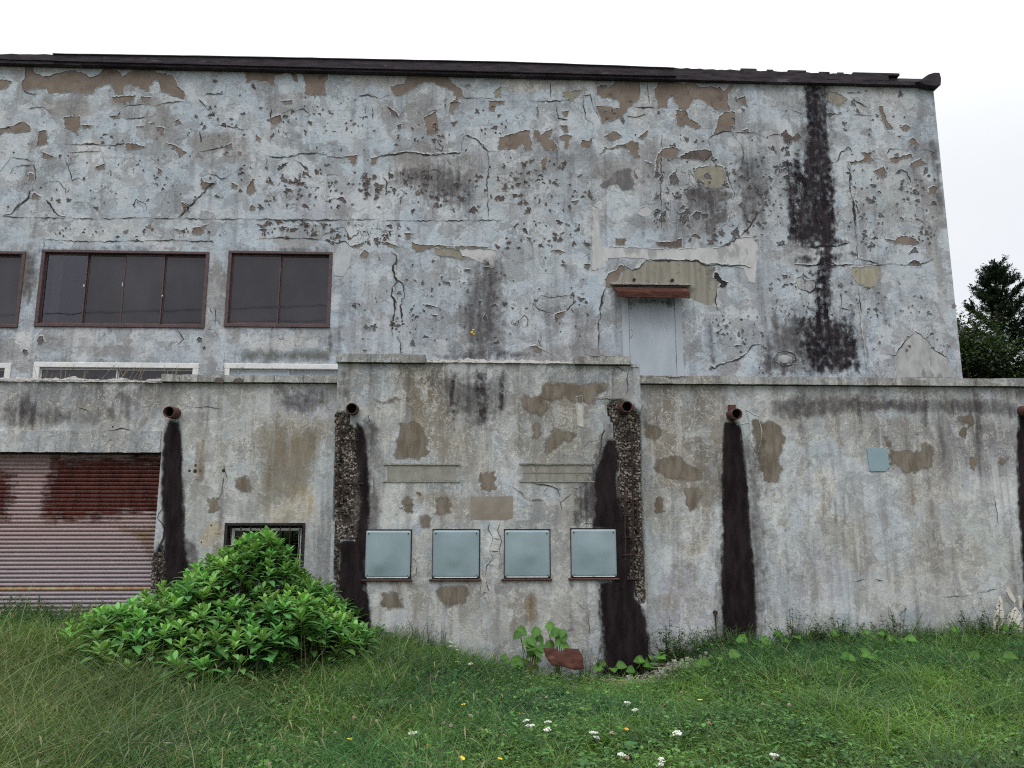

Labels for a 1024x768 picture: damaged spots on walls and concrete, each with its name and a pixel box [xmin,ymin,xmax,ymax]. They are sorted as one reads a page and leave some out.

crack [0,93,502,353]
peeling [63,72,805,353]
crack [589,131,947,400]
peeling [824,90,938,327]
rust [0,471,17,521]
rust [41,455,161,522]
leakage [161,420,197,587]
crack [479,521,502,605]
rust [543,647,584,670]
spalling [521,382,703,603]
leakage [575,427,652,679]
leakage [719,421,763,645]